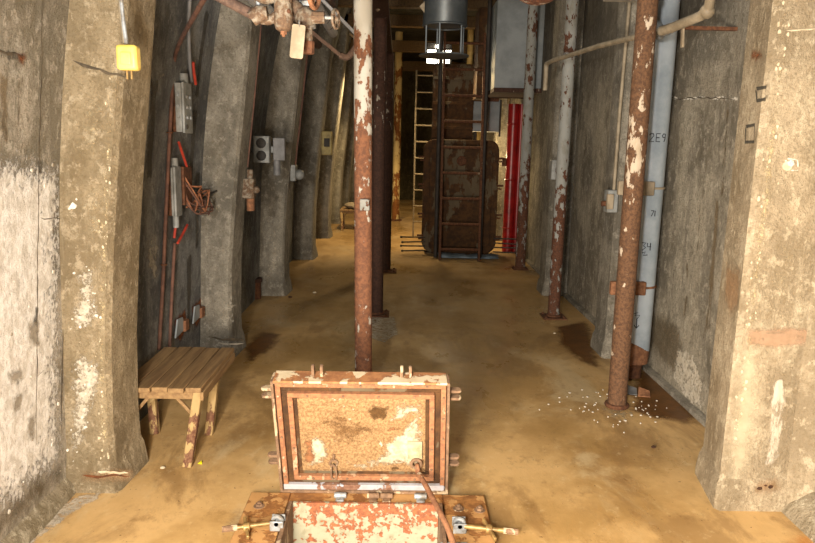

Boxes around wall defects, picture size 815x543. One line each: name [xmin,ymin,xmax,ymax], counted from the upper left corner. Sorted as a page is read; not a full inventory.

crack [0,50,24,63]
crack [73,60,125,77]
crack [34,67,60,444]
leakage [558,323,597,366]
leakage [66,357,103,462]
leakage [766,380,785,465]